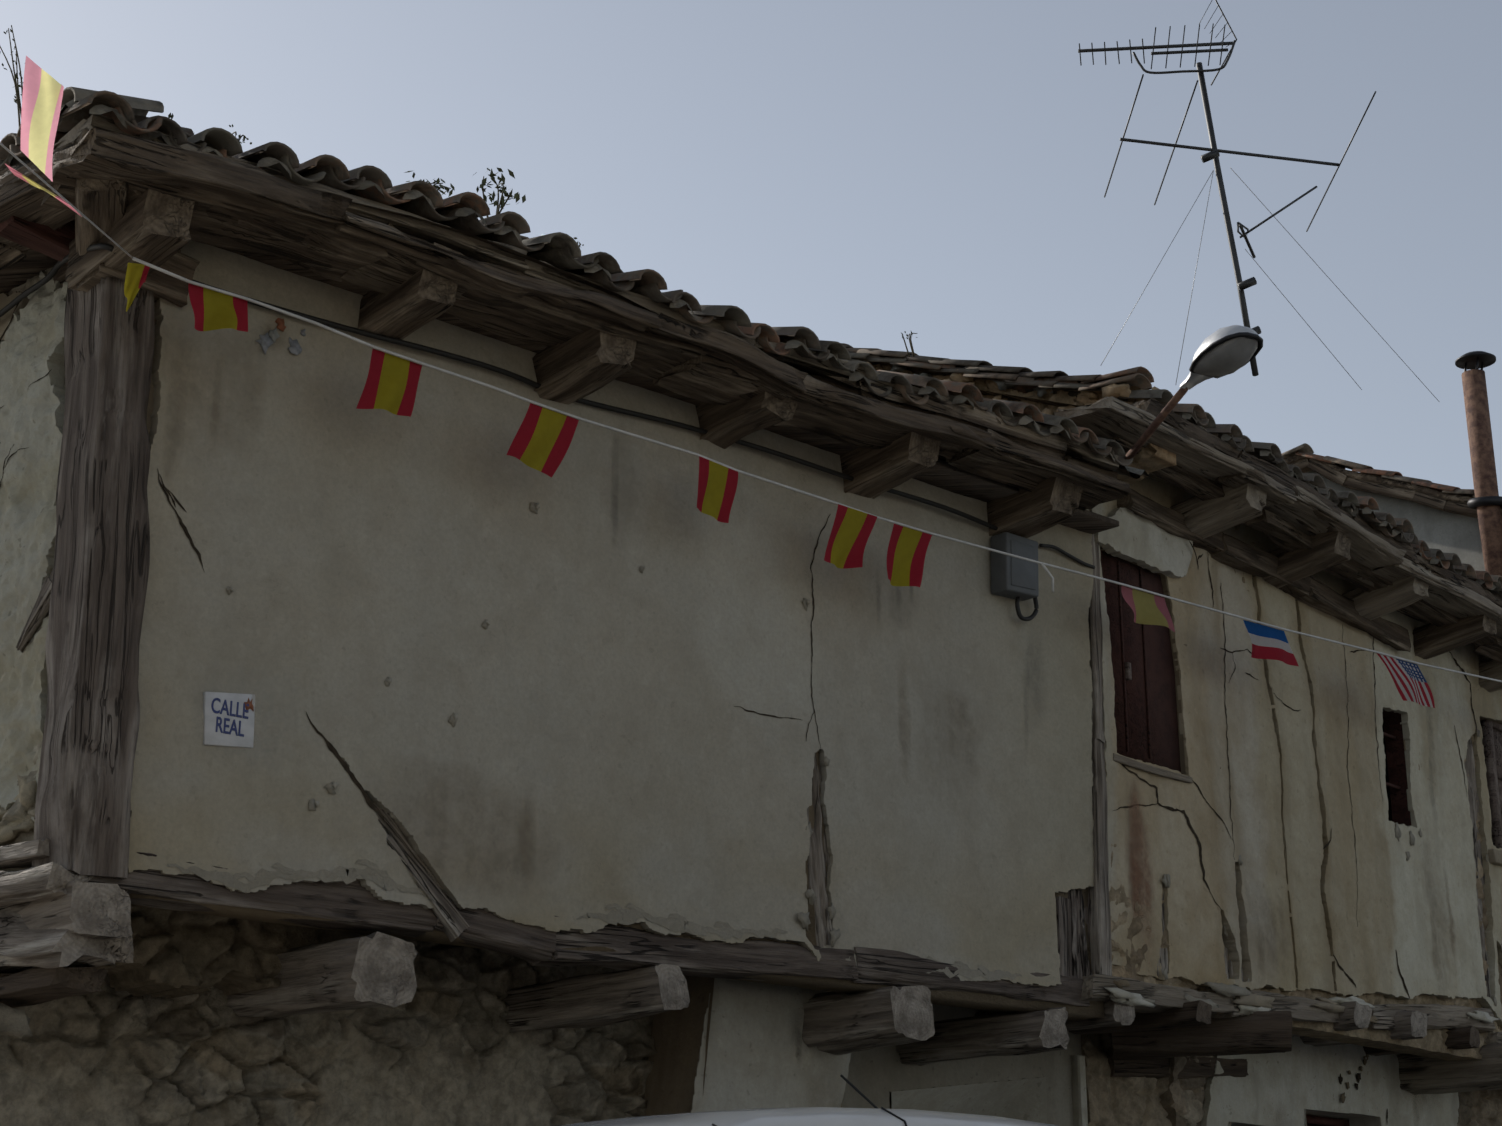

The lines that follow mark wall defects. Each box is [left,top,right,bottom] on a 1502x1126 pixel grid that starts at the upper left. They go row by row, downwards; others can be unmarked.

crack [0,301,21,341]
crack [0,446,29,486]
crack [157,468,205,573]
spalling [16,568,54,653]
crack [734,514,831,748]
spalling [0,775,37,846]
spalling [167,712,469,942]
crack [1113,539,1300,909]
crack [1323,625,1383,927]
crack [1449,651,1478,792]
crack [1333,954,1356,987]
crack [1396,951,1410,999]